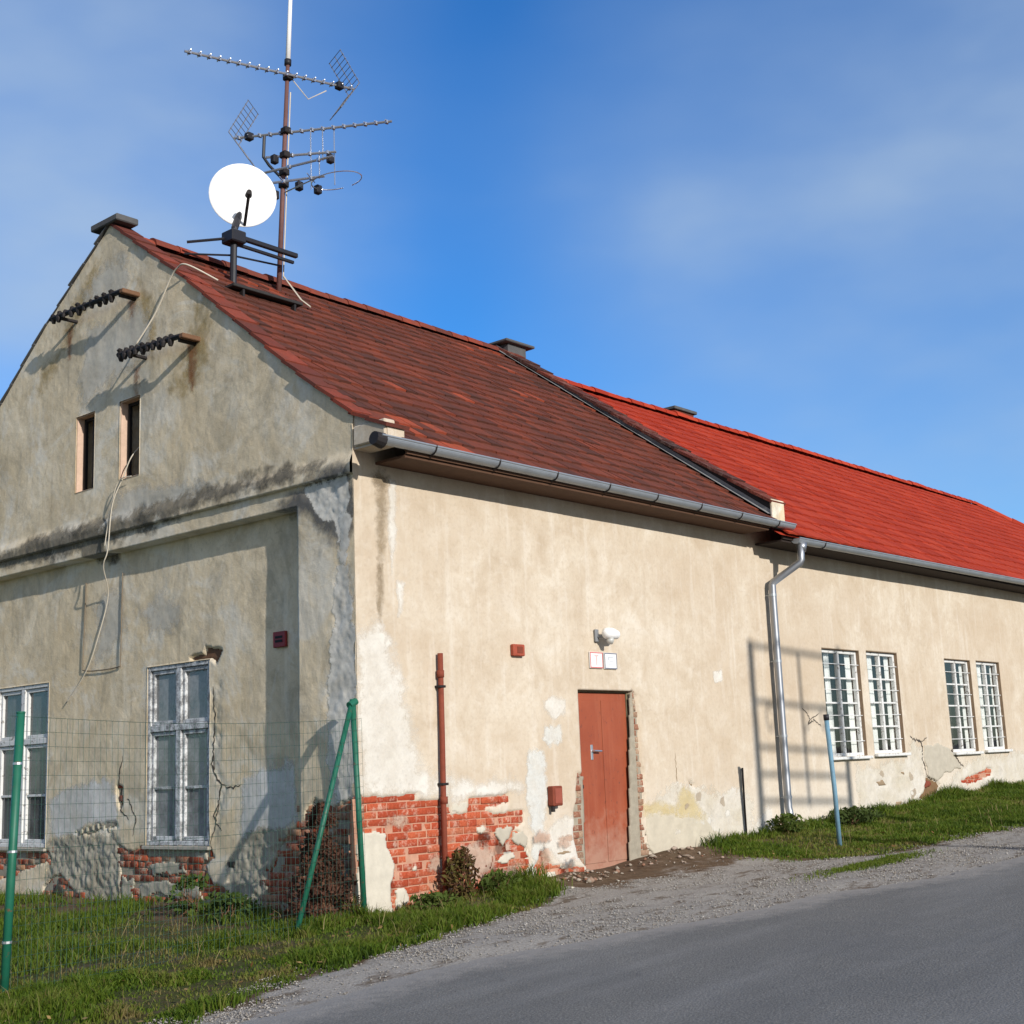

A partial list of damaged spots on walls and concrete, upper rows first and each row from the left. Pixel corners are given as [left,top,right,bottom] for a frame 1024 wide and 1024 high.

peeling [78,307,150,403]
water stain [0,462,354,567]
water stain [374,473,397,559]
crack [118,757,136,834]
crack [210,690,240,843]
spalling [0,473,585,914]
water stain [357,568,548,870]
crack [910,736,928,776]
peeling [854,741,1024,808]